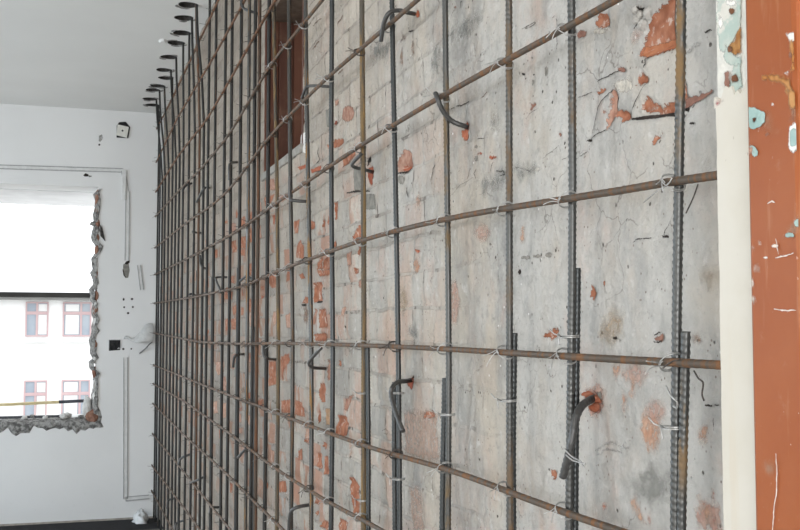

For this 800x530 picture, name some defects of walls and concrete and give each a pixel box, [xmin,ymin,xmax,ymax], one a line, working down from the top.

crack [548,63,648,160]
peeling [716,0,742,92]
peeling [748,107,768,136]
peeling [762,33,797,153]
spalling [0,189,105,436]
spalling [143,0,721,530]